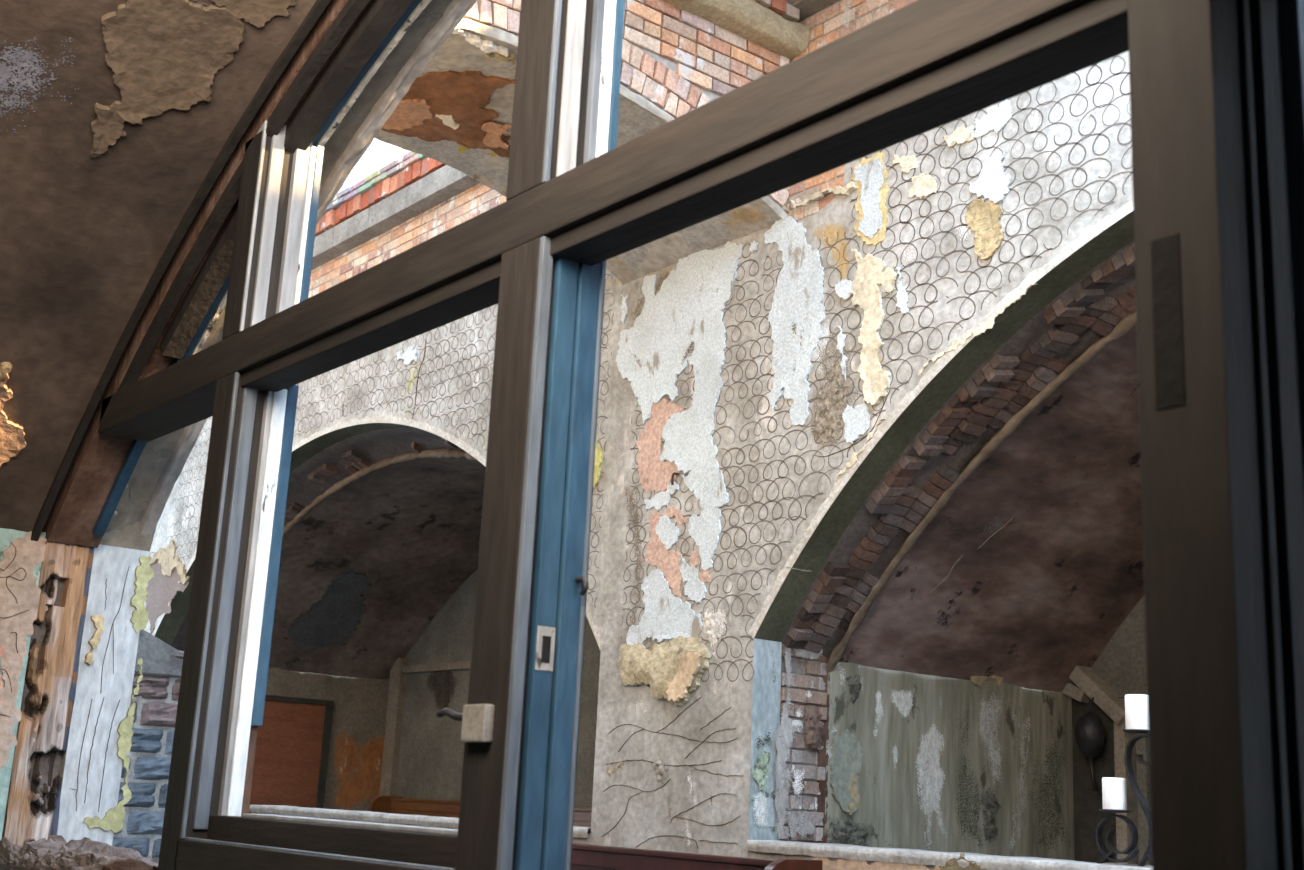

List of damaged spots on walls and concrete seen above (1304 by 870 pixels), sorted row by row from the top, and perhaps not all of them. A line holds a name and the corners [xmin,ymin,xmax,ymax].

spalling [381,24,516,158]
peeling [943,100,1012,147]
peeling [956,151,1011,260]
spalling [918,283,1036,376]
spalling [0,362,26,467]
peeling [616,152,937,645]
spalling [130,540,190,634]
peeling [82,658,143,833]
leakage [838,663,914,738]
leakage [915,692,1072,853]
leakage [826,813,893,847]
peeling [810,853,987,870]